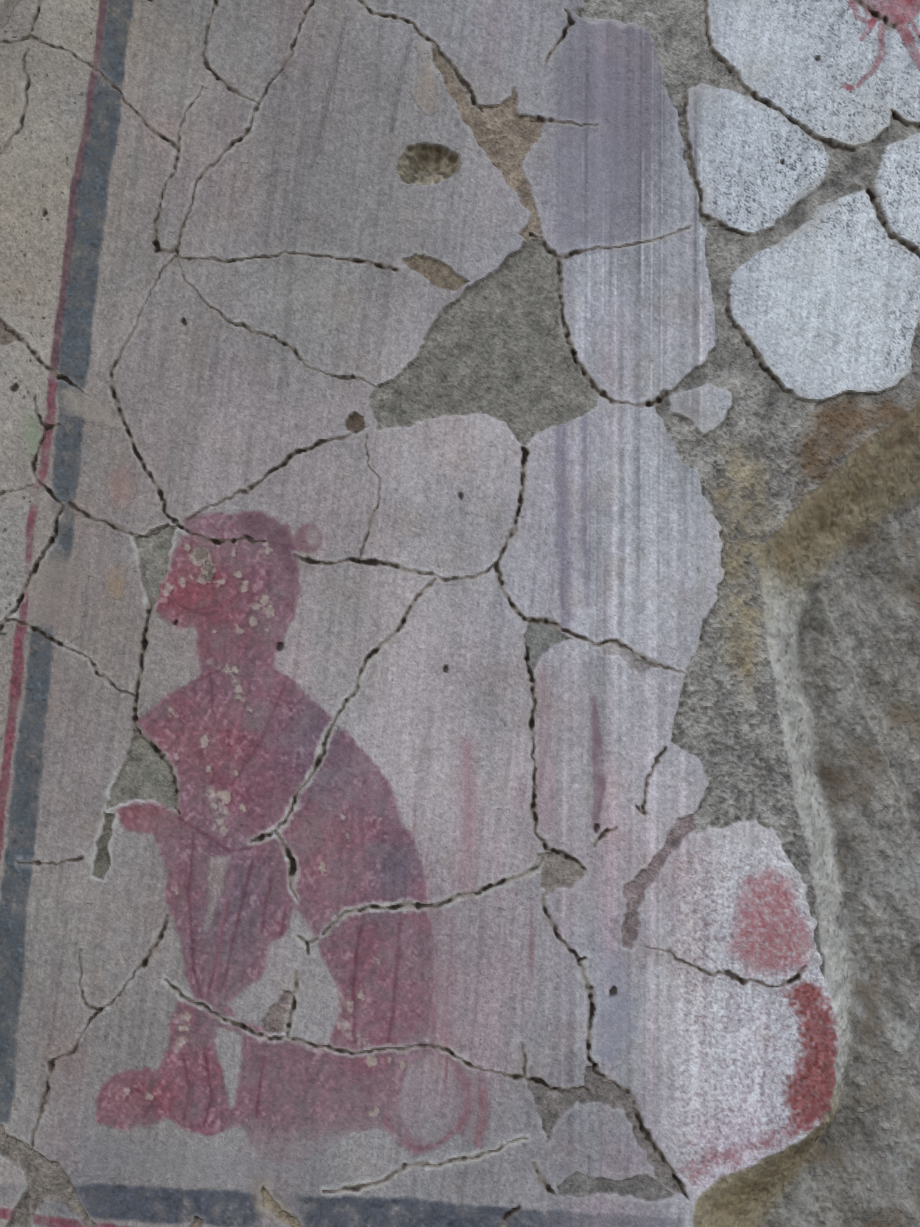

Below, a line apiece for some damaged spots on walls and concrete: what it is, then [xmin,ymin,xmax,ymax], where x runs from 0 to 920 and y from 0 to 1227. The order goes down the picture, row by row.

spalling [346,47,601,448]
crack [528,97,751,409]
spalling [574,0,920,979]
spalling [136,527,285,651]
crack [0,0,691,1201]
peeling [223,665,253,713]
spalling [93,731,180,881]
peeling [206,790,247,813]
peeling [179,1012,193,1047]
crack [647,947,807,990]
spalling [0,1125,96,1227]
crack [323,1138,557,1227]